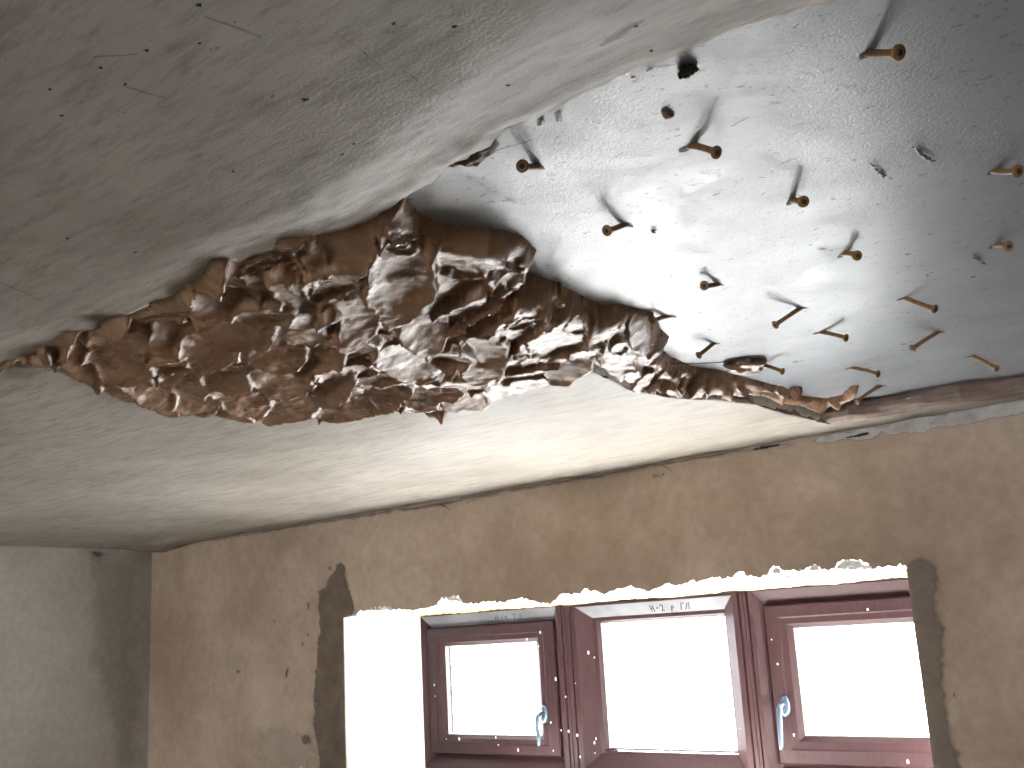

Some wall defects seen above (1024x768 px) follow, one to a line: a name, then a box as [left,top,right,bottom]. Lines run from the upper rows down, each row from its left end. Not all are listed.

spalling [677,63,699,79]
peeling [435,140,504,180]
spalling [812,399,1024,443]